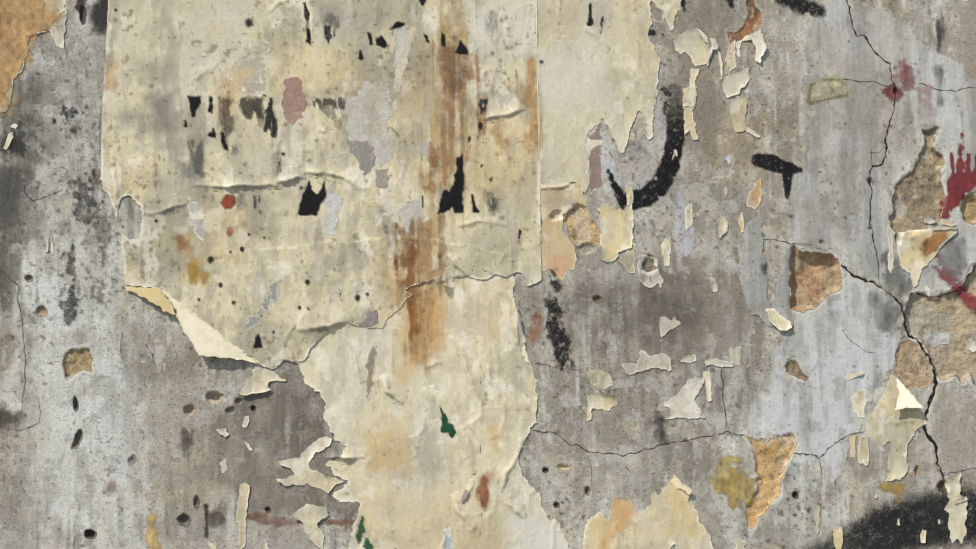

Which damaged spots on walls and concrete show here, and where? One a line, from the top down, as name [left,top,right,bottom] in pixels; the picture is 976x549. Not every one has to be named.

rust [0,0,68,114]
rust [419,0,509,195]
spalling [727,0,762,43]
rust [394,208,453,371]
peeling [739,0,976,538]
crack [840,0,976,501]
spalling [61,343,96,412]
spalling [177,495,200,527]
spalling [183,404,196,417]
spalling [206,391,256,416]
crack [532,370,760,486]
crack [794,430,866,484]